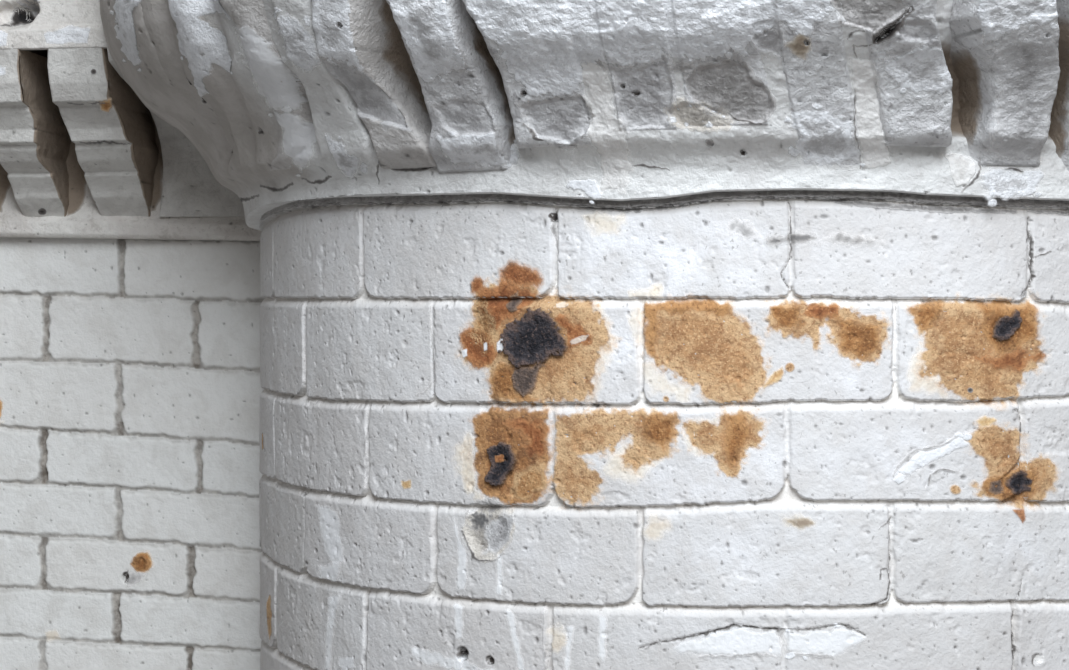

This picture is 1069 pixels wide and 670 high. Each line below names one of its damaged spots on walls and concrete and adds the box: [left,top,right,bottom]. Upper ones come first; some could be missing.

peeling [110,0,141,71]
peeling [168,0,411,178]
rust [460,262,889,506]
rust [908,298,1058,523]
rust [127,553,152,586]
peeling [638,623,865,660]